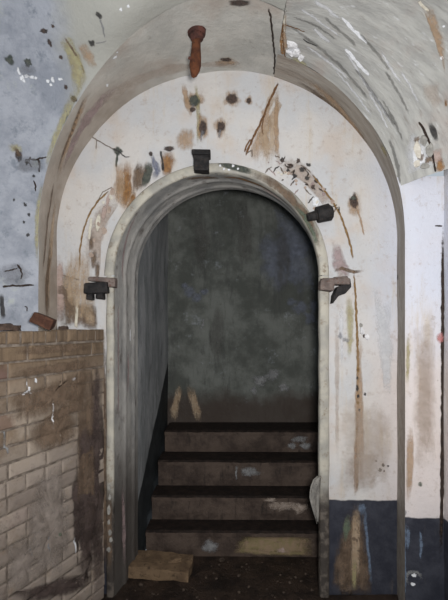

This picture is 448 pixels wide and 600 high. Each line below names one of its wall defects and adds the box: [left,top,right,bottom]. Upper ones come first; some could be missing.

corrosion [418,1,445,60]
crack [244,10,305,156]
corrosion [255,101,281,151]
flaking render [409,122,444,171]
corrosion [113,146,173,207]
flaking render [265,155,340,213]
corrosion [353,276,366,488]
damp [34,373,107,575]
damp [16,576,85,600]